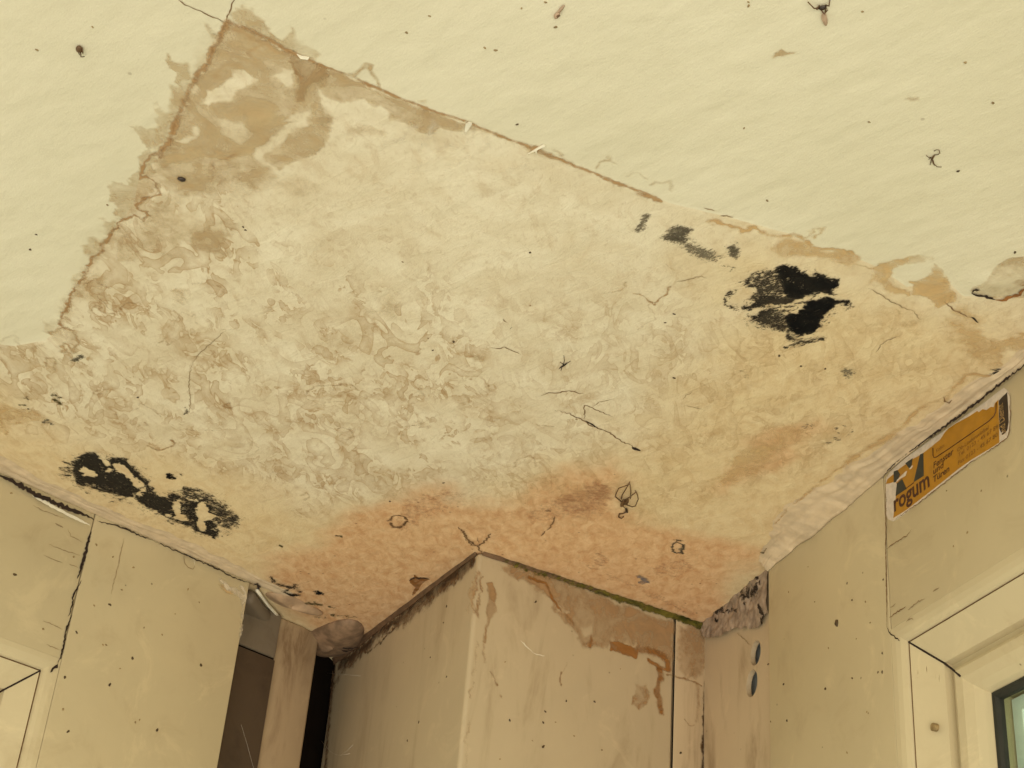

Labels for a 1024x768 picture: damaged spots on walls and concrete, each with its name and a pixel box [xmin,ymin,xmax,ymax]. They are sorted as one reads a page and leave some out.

leakage [144,10,372,195]
leakage [662,225,740,270]
leakage [711,220,761,233]
leakage [723,235,858,349]
leakage [874,258,956,308]
peeling [972,284,1024,302]
crack [544,390,641,451]
leakage [59,452,240,540]
crack [0,475,261,673]
leakage [269,577,352,619]
leakage [713,576,764,624]
corrosion [510,566,704,715]